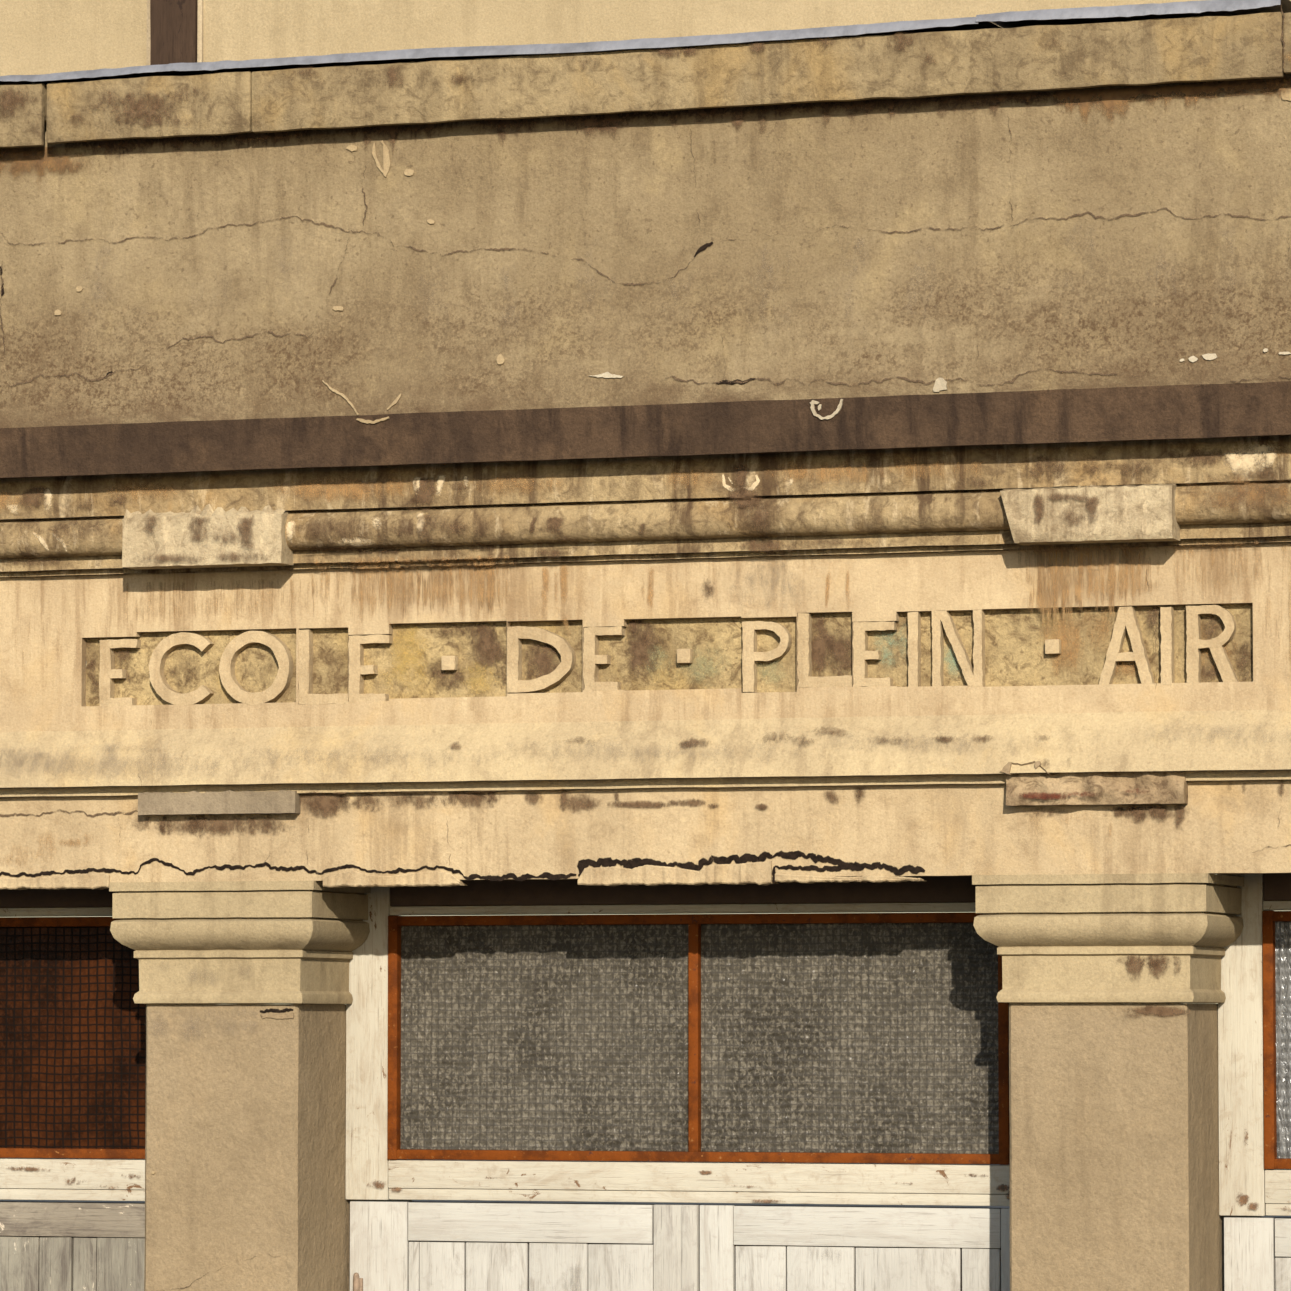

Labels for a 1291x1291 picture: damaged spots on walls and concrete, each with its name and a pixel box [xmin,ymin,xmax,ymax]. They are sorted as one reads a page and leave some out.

crack [832,202,1291,234]
crack [0,166,735,354]
crack [11,331,314,386]
flaking render [1180,353,1218,363]
crack [668,376,785,385]
crack [821,369,1117,386]
damp [138,815,284,834]
crack [0,828,925,883]
flaking render [578,861,926,886]